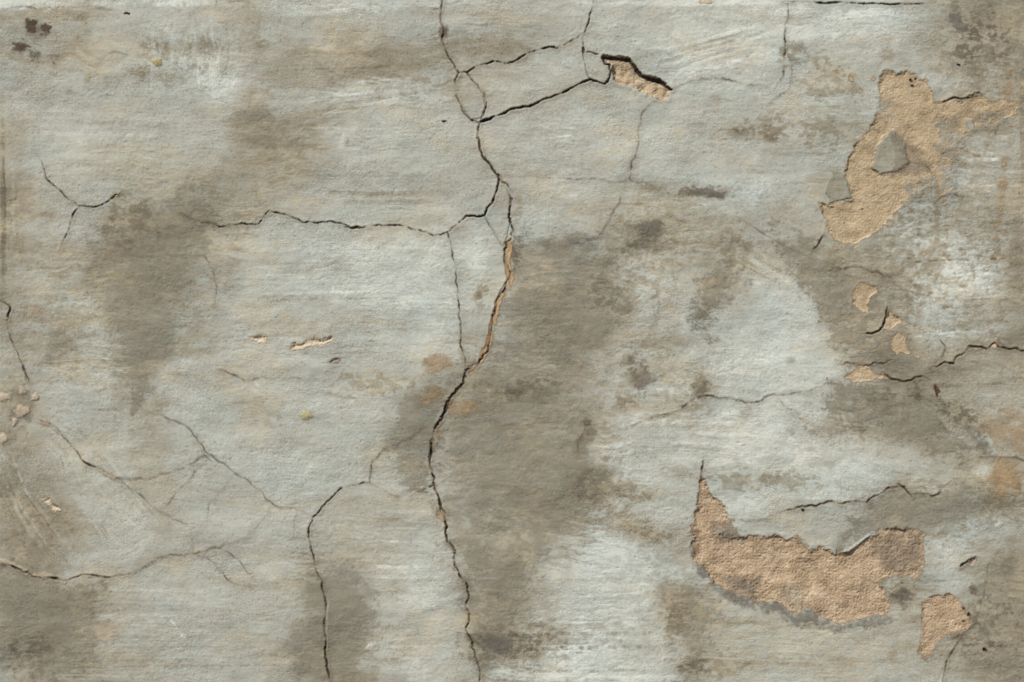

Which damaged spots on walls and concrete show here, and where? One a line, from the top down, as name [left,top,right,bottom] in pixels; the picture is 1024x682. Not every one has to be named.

flaking render [585,51,672,100]
crack [45,173,117,237]
flaking render [815,70,1019,263]
leakage [77,182,225,415]
crack [218,5,591,681]
leakage [687,259,752,344]
flaking render [866,297,920,358]
crack [846,342,1024,387]
leakage [384,342,603,669]
flaking render [687,465,930,628]
crack [787,483,940,511]
flaking render [912,593,974,660]